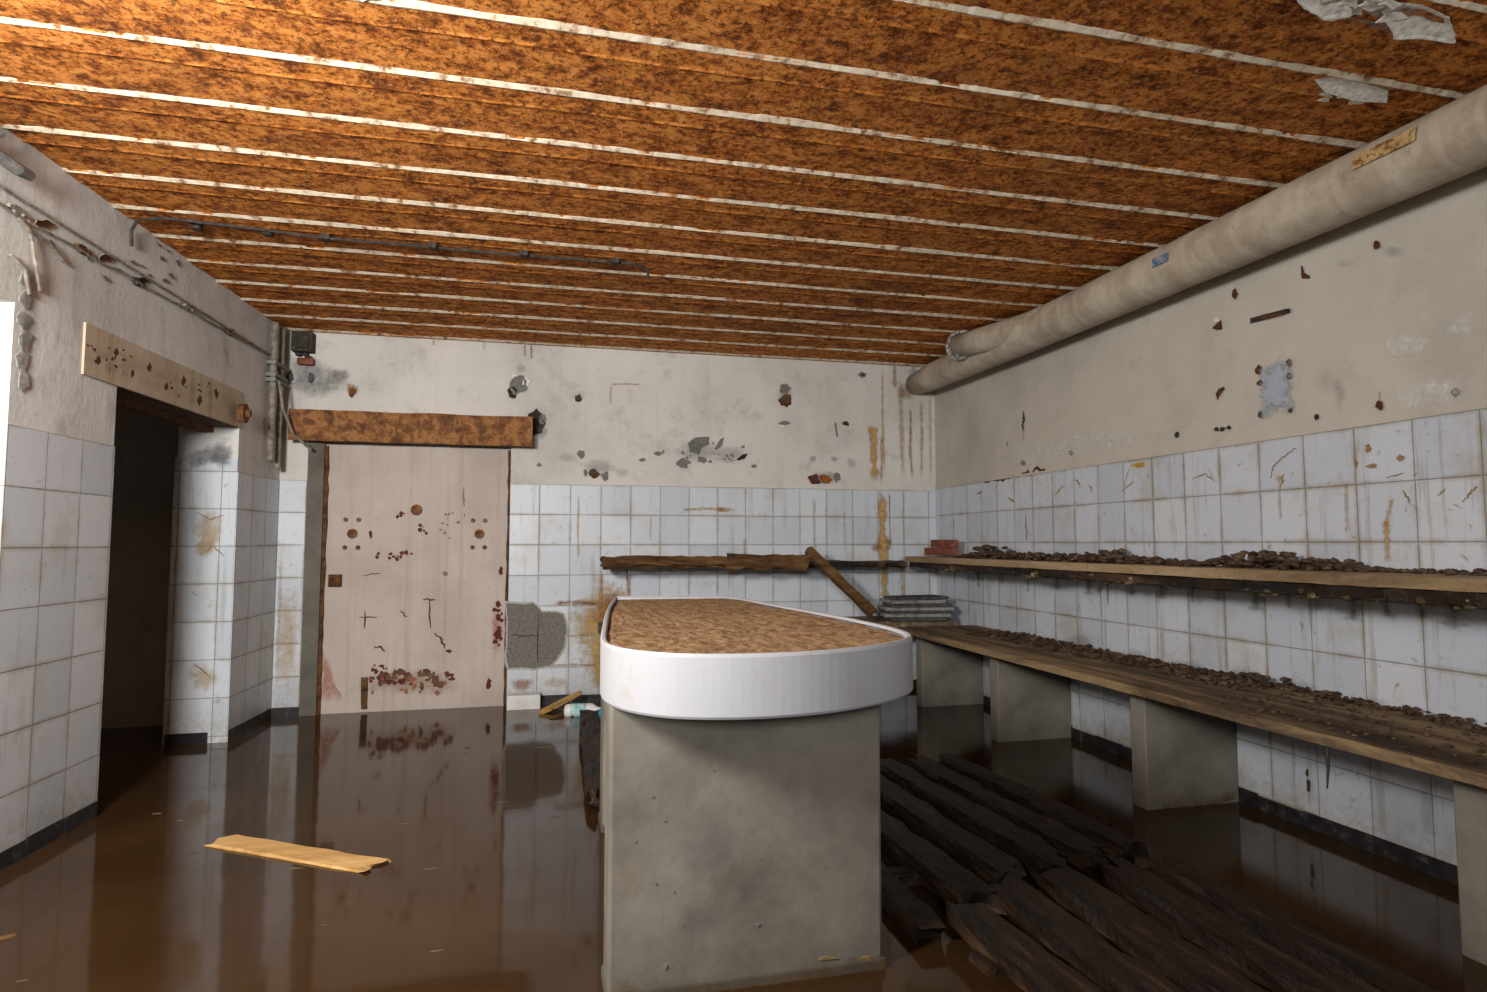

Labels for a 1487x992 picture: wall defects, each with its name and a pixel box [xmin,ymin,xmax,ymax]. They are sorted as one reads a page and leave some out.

peeling [1297,0,1456,44]
peeling [639,436,756,469]
rust [878,496,903,596]
spalling [504,601,569,671]
rust [368,664,455,696]